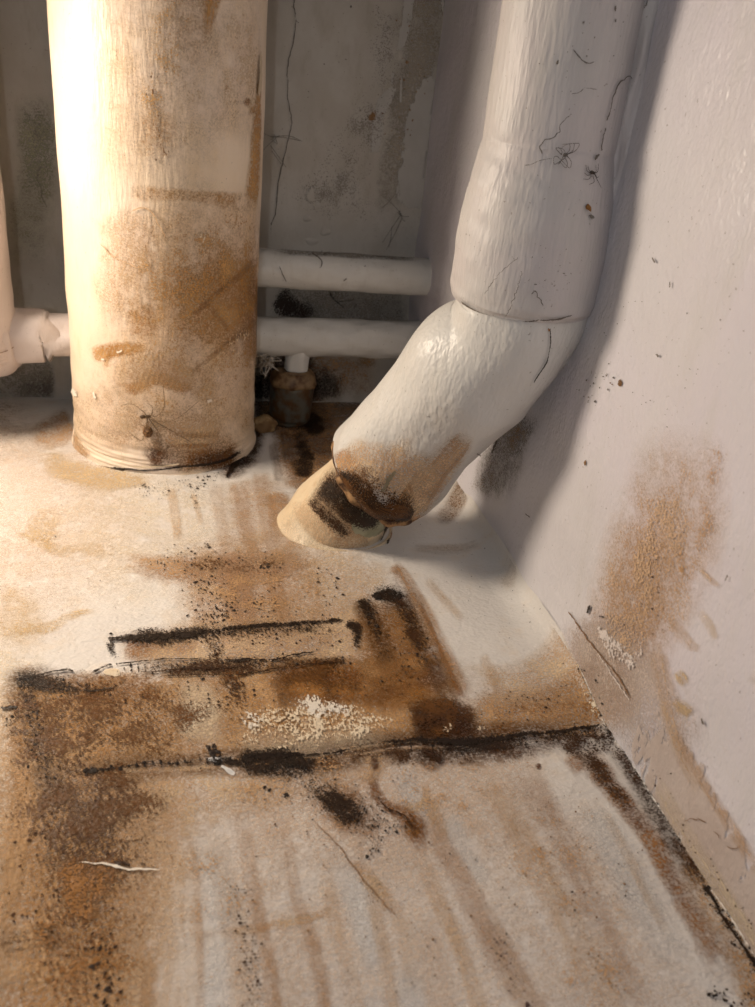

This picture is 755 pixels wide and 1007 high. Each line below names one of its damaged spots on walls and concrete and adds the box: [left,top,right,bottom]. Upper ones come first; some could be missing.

corrosion [139,0,190,165]
corrosion [225,27,261,200]
crack [271,0,299,225]
corrosion [71,388,103,456]
corrosion [94,194,258,471]
corrosion [0,401,755,1007]